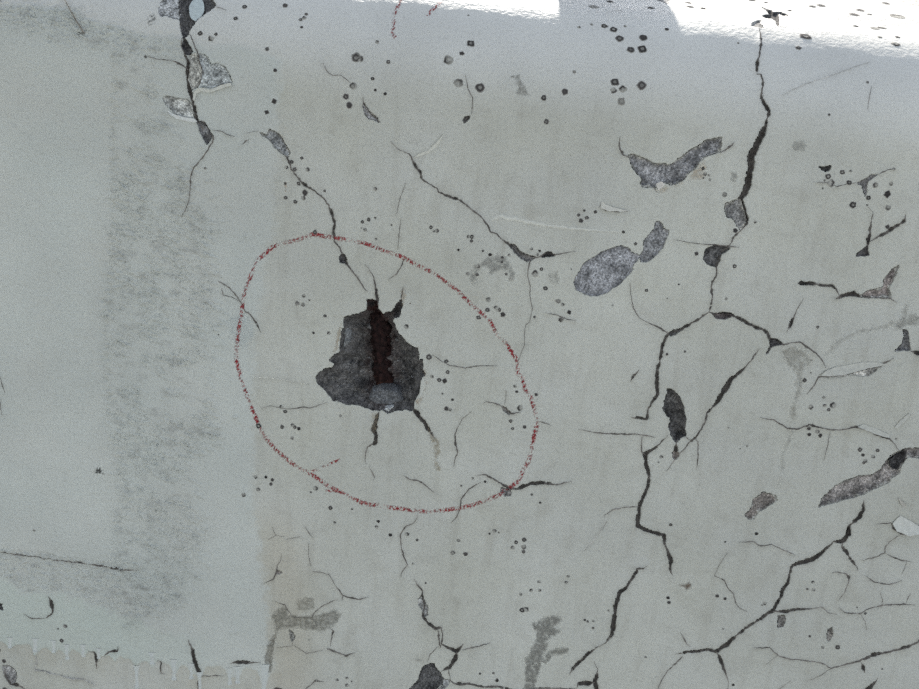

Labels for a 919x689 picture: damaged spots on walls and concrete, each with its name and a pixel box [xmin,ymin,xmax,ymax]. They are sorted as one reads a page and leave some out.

crack [147,0,364,288]
spalling [316,266,435,481]
crack [389,134,575,361]
spalling [574,221,669,296]
spalling [663,389,686,459]
spalling [618,138,734,192]
crack [583,7,906,576]
spalling [819,448,919,507]
spalling [410,663,450,689]
crack [400,520,509,689]
crack [534,567,645,689]
crack [658,501,919,689]